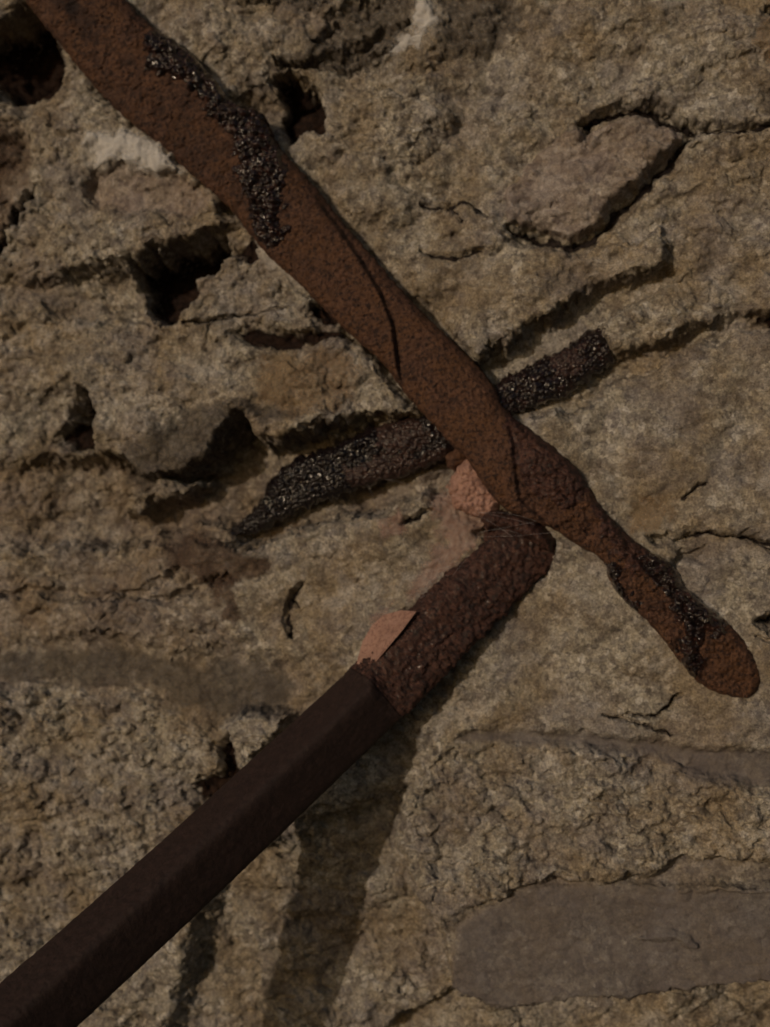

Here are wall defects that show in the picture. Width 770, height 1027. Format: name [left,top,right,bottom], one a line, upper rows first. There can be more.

rust [374,417,432,459]
rust [445,449,467,472]
rust [163,532,269,622]